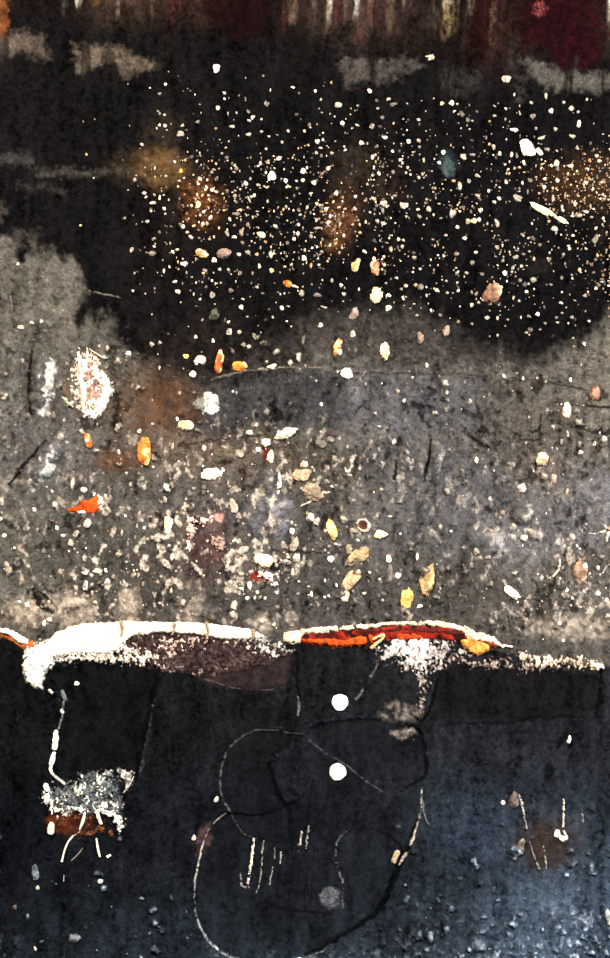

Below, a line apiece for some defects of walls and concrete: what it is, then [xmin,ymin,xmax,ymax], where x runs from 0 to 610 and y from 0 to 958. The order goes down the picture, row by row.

crack [468,377,610,470]
peeling [0,620,604,862]